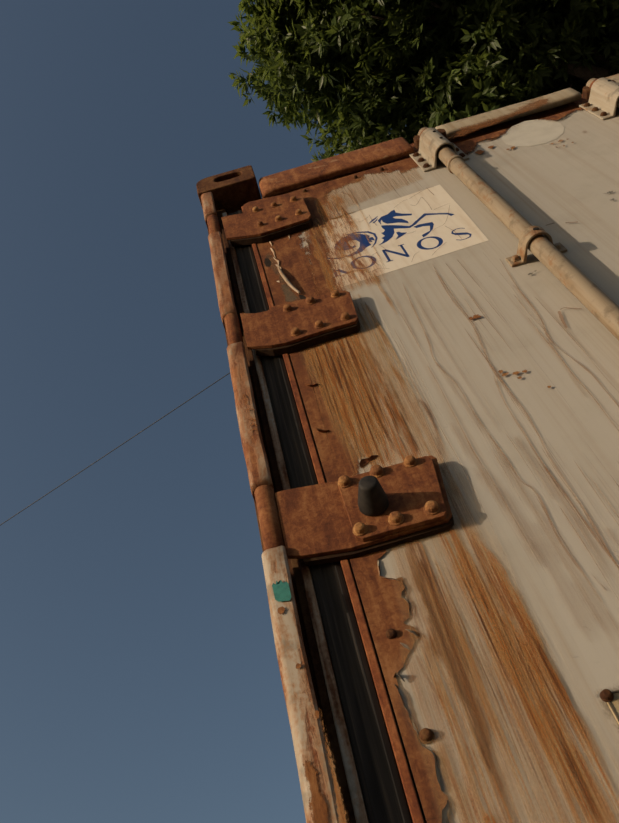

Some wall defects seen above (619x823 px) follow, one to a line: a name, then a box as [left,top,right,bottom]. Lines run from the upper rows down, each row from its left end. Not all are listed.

corrosion [446,99,548,140]
corrosion [292,181,391,304]
corrosion [305,302,451,483]
corrosion [303,715,347,823]
peeling [350,549,451,823]
corrosion [406,495,619,823]